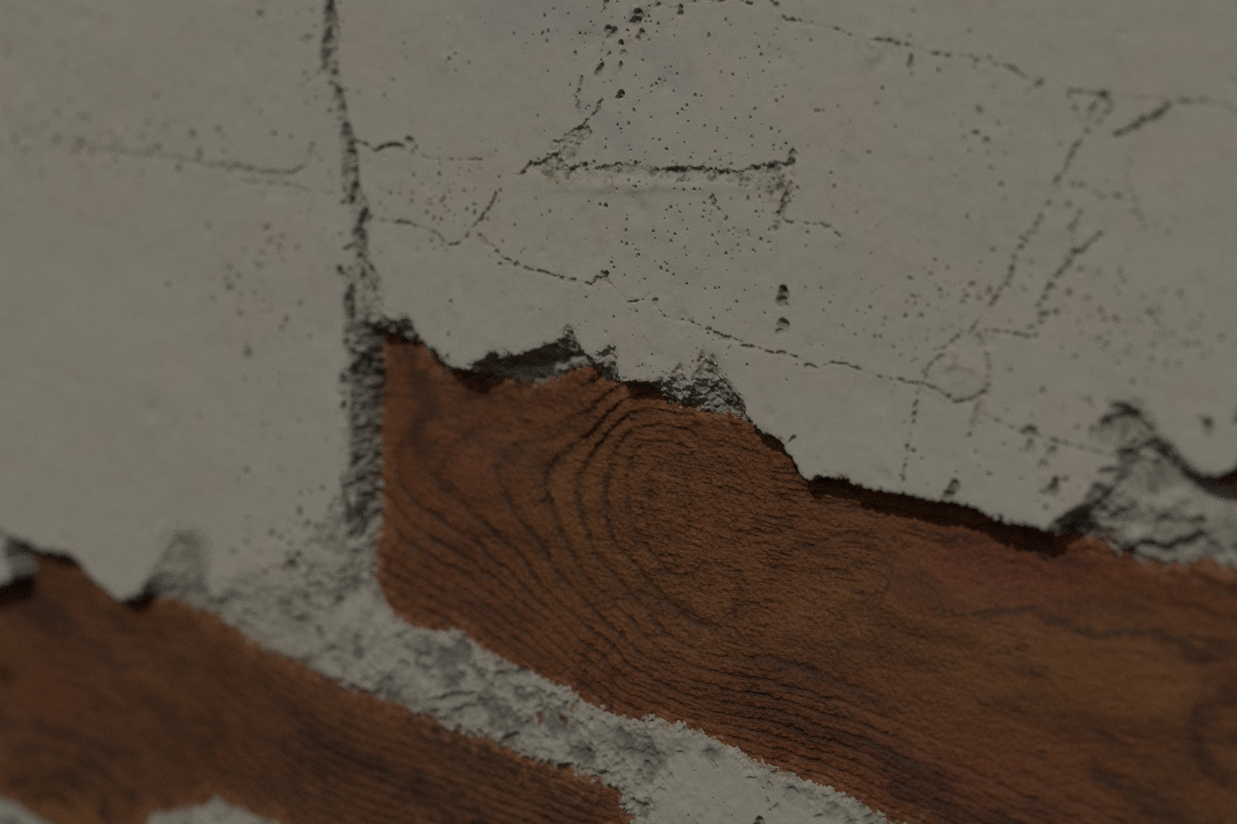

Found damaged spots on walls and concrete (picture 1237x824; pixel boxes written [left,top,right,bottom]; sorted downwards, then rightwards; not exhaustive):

crack [70,0,1237,543]
flaking render [355,290,782,443]
peeling [935,350,983,398]
flaking render [329,383,385,596]
flaking render [1060,396,1205,550]
flaking render [135,524,226,616]